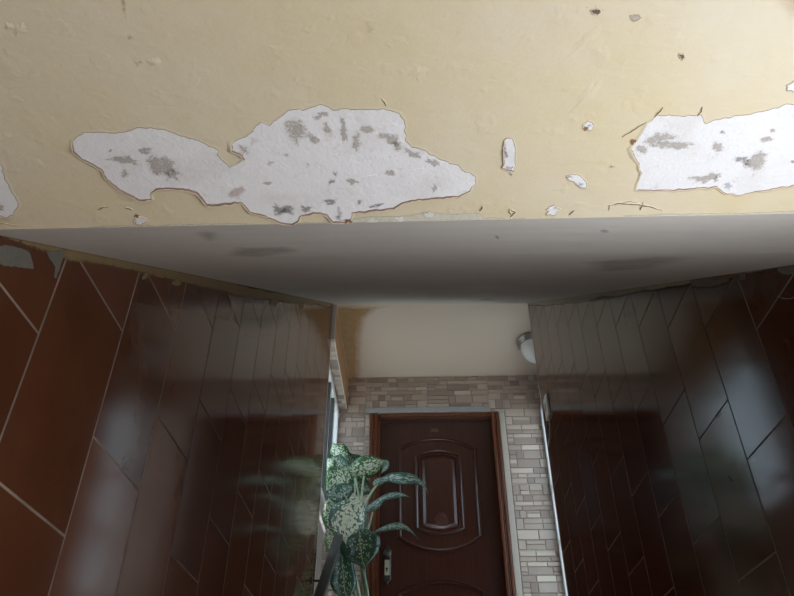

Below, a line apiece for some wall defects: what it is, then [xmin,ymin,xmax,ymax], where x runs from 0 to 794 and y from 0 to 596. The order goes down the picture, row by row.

peeling [0,161,22,221]
peeling [69,102,502,226]
peeling [501,137,517,176]
peeling [566,173,588,189]
peeling [622,80,794,197]